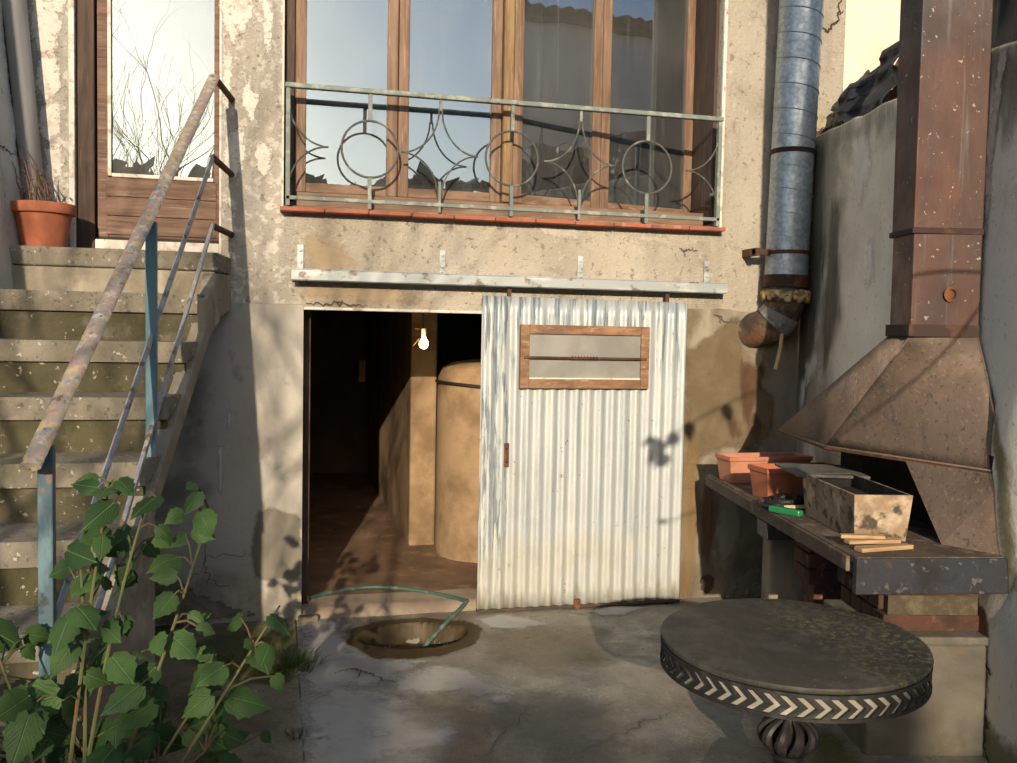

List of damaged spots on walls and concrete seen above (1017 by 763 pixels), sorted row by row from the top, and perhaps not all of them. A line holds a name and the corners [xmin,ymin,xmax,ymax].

peeling [29,0,67,185]
peeling [218,0,274,116]
peeling [223,79,272,179]
crack [822,0,843,33]
water stain [997,47,1017,122]
water stain [679,149,839,599]
water stain [593,606,645,616]
water stain [298,614,544,763]